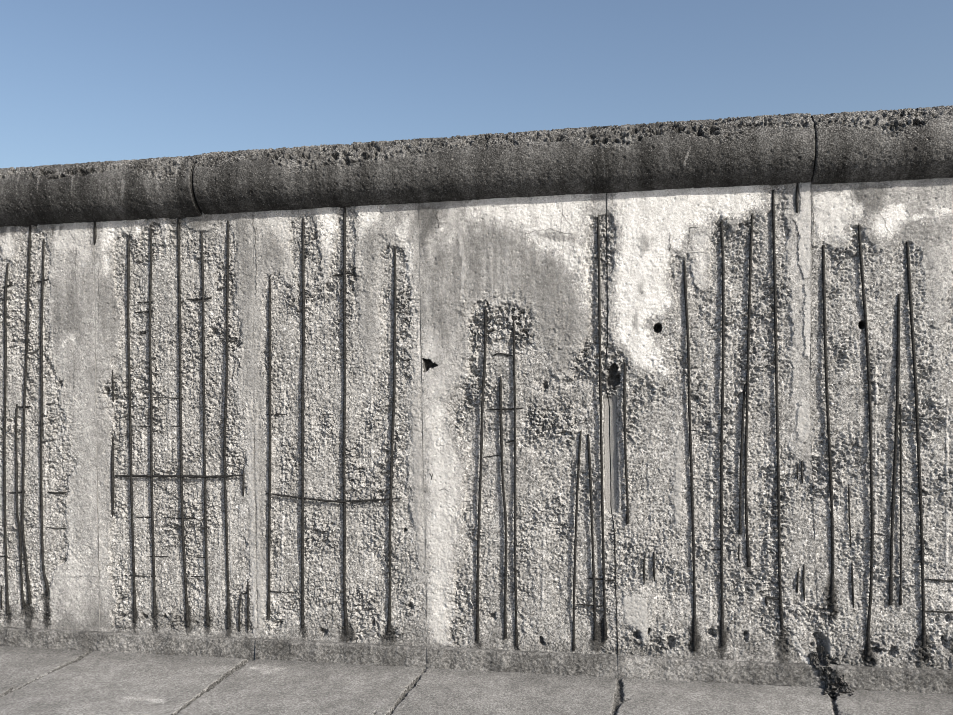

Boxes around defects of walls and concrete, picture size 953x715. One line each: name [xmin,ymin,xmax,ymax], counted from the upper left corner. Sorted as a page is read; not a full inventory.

spalling [0,183,953,697]
water stain [417,230,574,366]